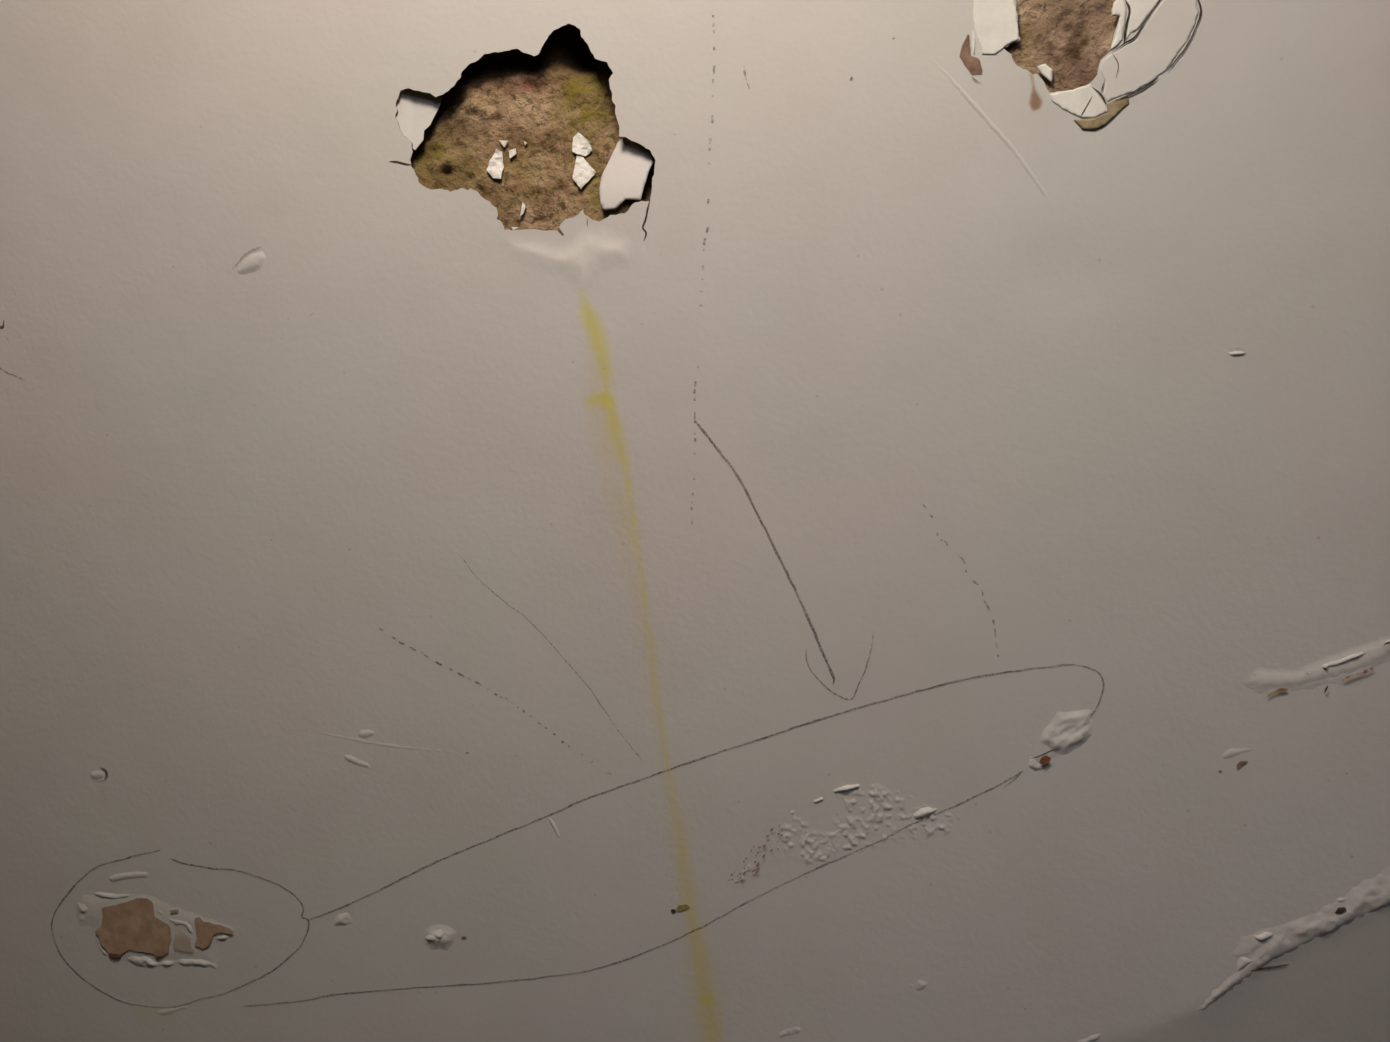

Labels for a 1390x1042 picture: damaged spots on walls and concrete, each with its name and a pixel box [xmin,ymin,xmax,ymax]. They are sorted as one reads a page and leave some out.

spalling [960,0,1202,130]
spalling [389,24,655,240]
peeling [76,871,234,970]